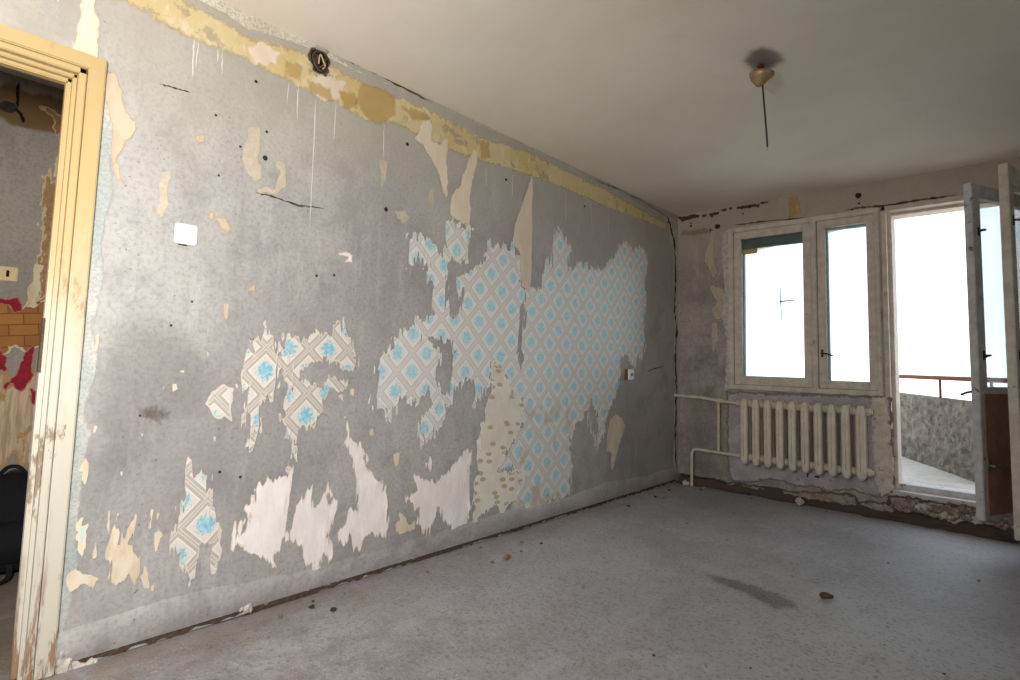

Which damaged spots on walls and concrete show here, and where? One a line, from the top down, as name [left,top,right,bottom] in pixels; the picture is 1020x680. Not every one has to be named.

peeling [311,75,346,102]
peeling [257,161,287,194]
flaking render [58,94,113,633]
peeling [0,369,38,468]